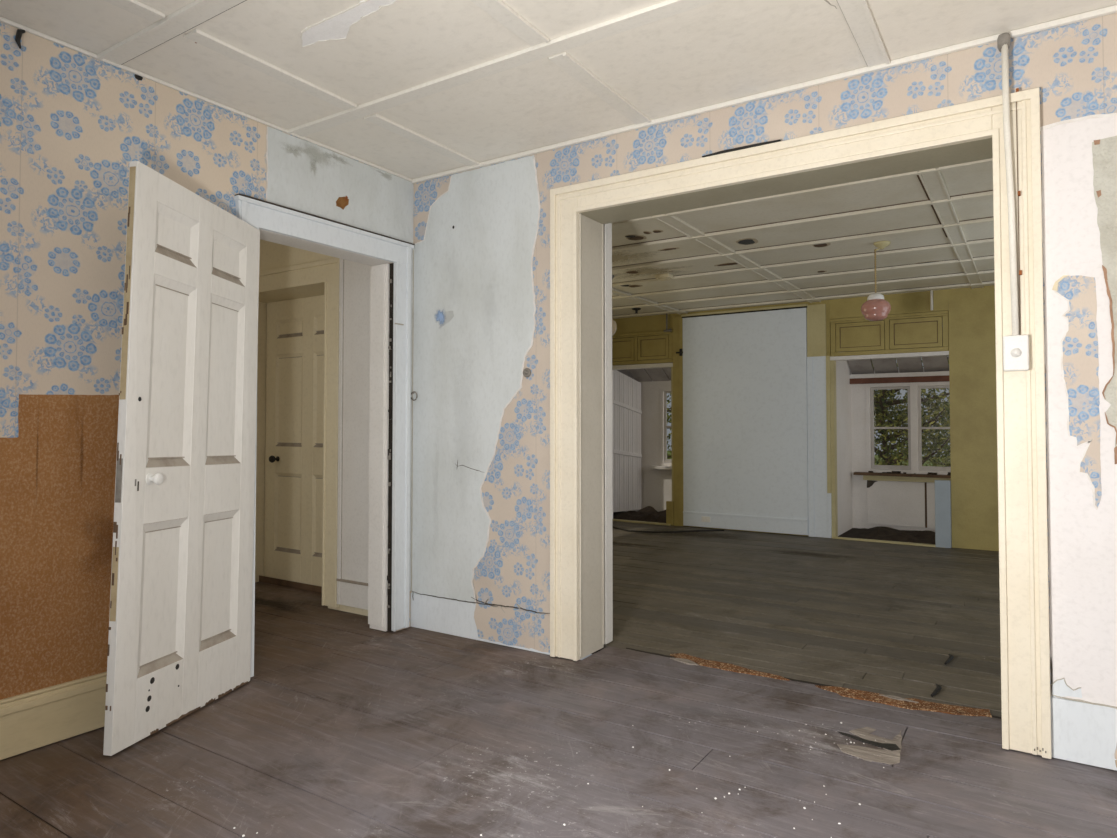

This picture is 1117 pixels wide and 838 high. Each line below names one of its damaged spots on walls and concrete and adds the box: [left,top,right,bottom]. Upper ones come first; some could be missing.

peeling [300,0,398,48]
spalling [336,196,349,210]
peeling [0,393,119,700]
peeling [412,155,541,604]
peeling [1040,113,1117,707]